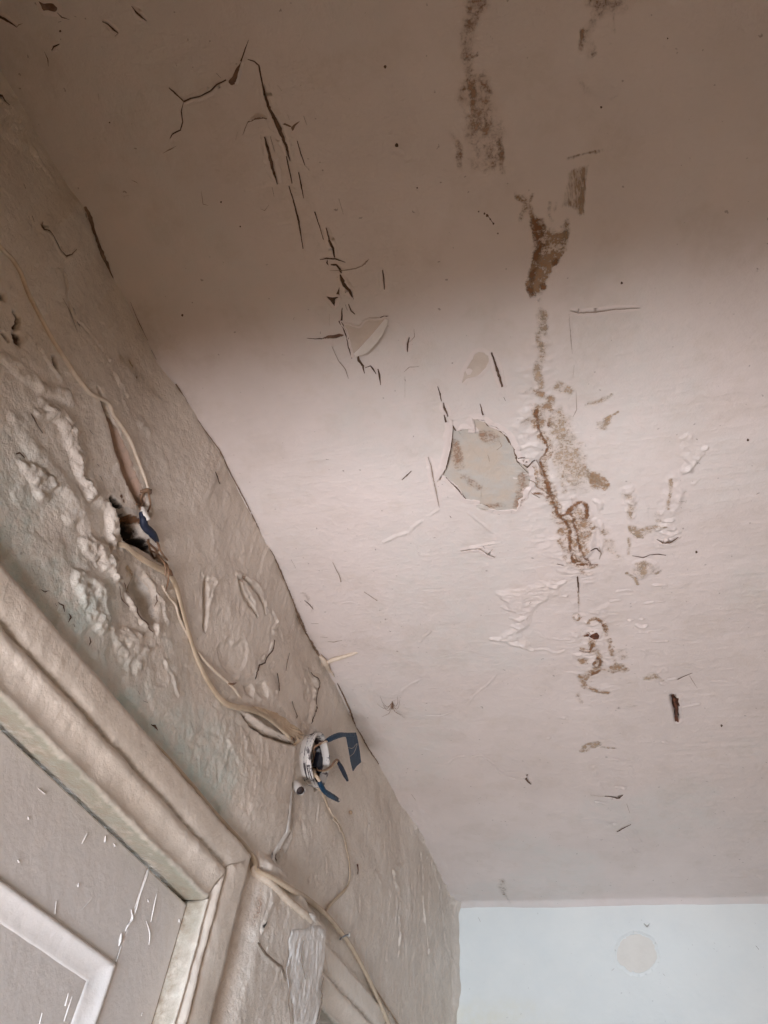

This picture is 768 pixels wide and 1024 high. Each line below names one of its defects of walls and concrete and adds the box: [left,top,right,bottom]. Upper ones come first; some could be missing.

leakage [460,0,492,135]
crack [164,73,228,153]
crack [236,59,389,333]
leakage [568,168,585,214]
crack [32,206,113,278]
peeling [308,316,389,385]
leakage [534,312,572,393]
spalling [433,414,536,515]
leakage [551,411,610,491]
spalling [286,925,326,1024]